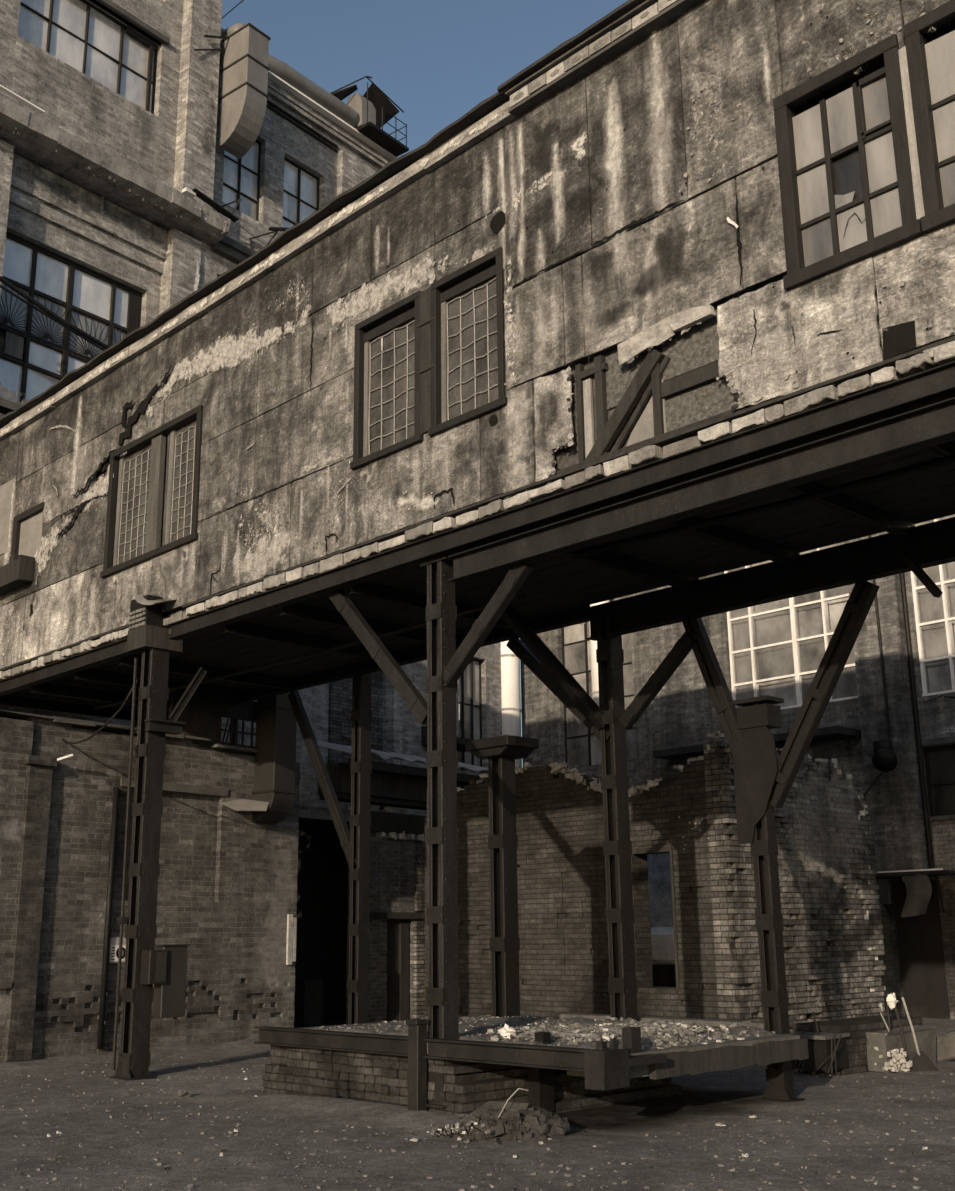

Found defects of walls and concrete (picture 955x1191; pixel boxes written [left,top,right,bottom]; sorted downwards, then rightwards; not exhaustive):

water stain [519,123,557,171]
water stain [608,115,619,181]
peeling [306,185,388,239]
spalling [136,285,311,439]
peeling [238,250,285,284]
spalling [326,246,493,331]
water stain [582,304,625,325]
water stain [635,225,693,295]
crack [735,193,757,354]
crack [792,326,842,344]
crack [47,365,172,538]
spalling [35,464,114,585]